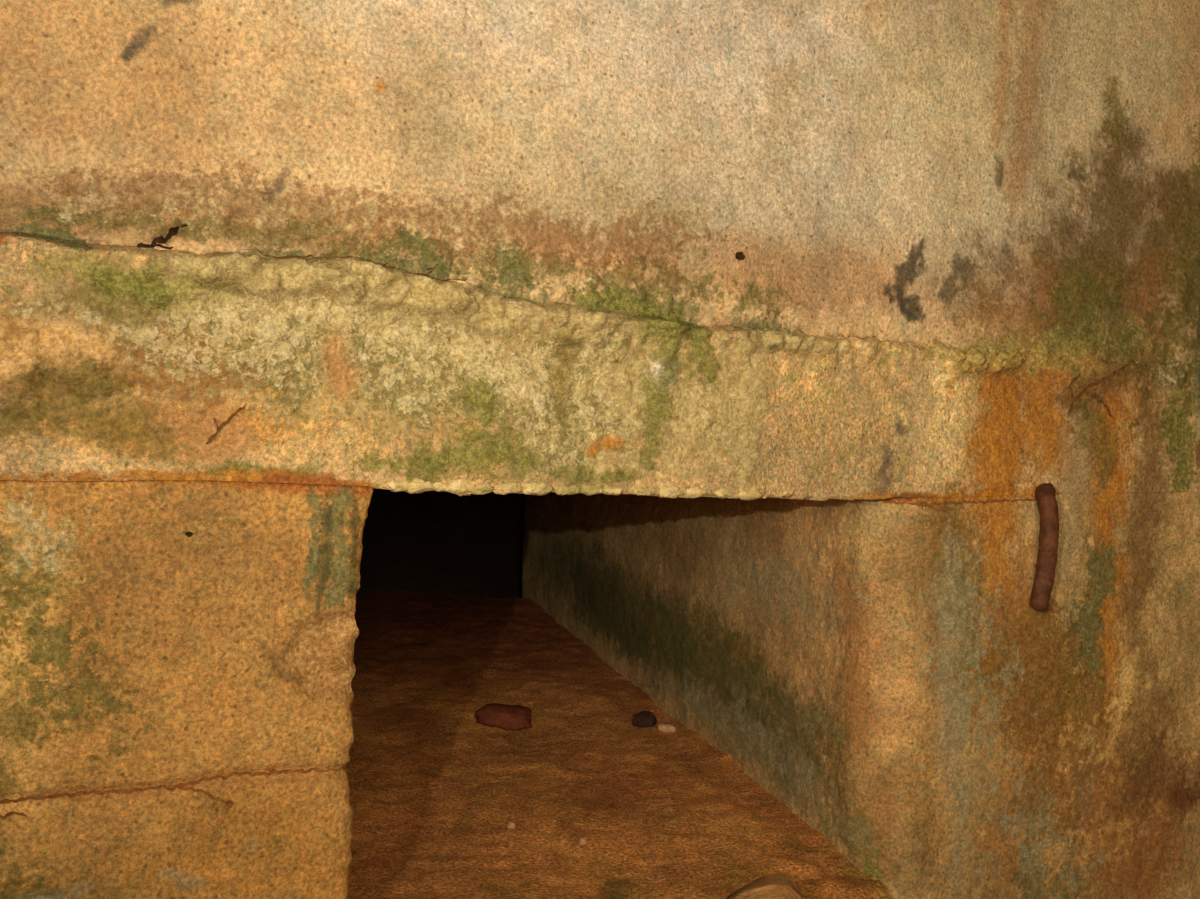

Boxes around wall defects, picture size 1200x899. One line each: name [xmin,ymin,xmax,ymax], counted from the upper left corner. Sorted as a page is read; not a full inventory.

crack [136,224,188,249]
leakage [1019,81,1200,357]
crack [240,249,469,284]
leakage [885,239,924,321]
leakage [940,258,1000,314]
leakage [7,259,769,492]
crack [865,498,1036,511]
corrosion [856,320,1161,754]
crack [0,767,345,819]